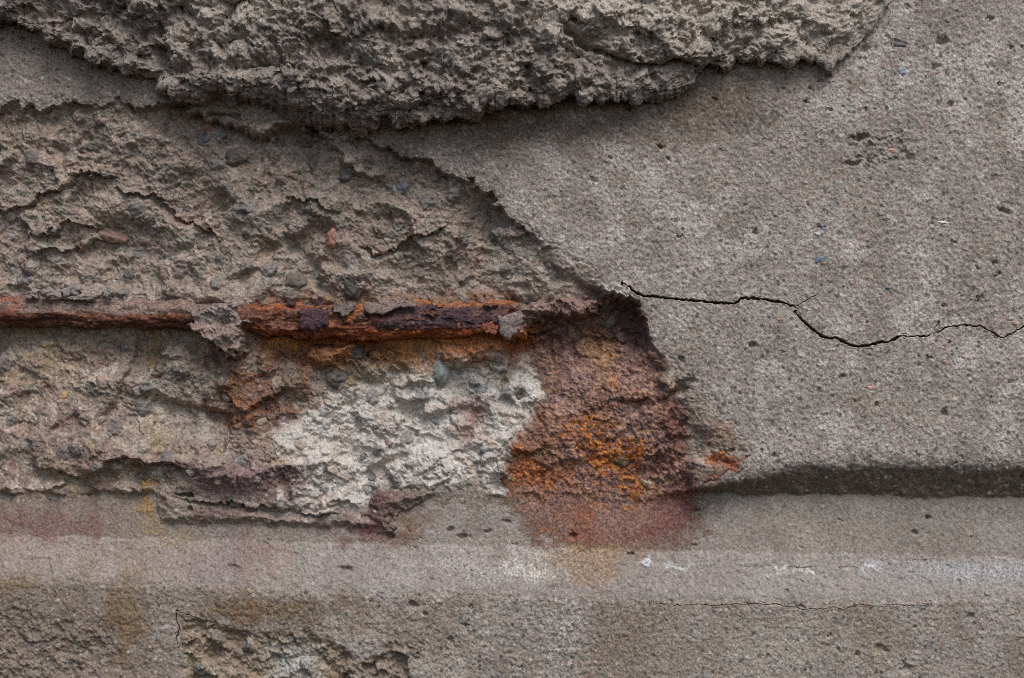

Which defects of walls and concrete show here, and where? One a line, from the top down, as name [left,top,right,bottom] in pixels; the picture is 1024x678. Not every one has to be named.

spalling [0,96,752,534]
corrosion [258,291,709,583]
corrosion [705,451,740,487]
crack [623,281,1024,350]